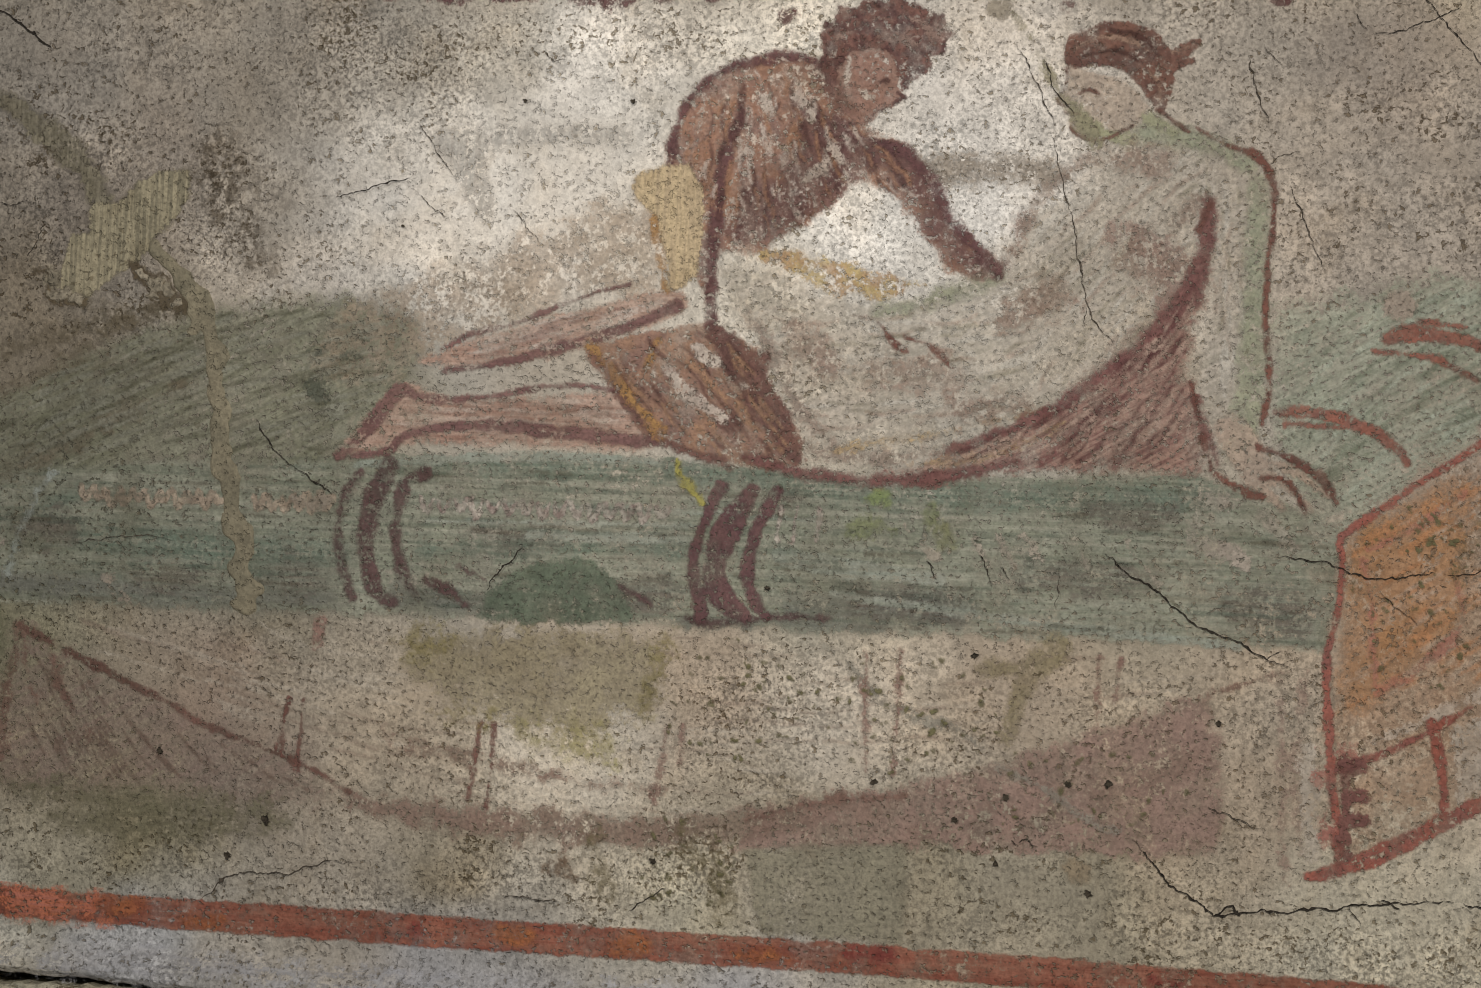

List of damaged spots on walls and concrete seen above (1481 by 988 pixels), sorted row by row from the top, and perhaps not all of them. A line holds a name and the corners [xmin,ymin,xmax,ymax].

crack [1109,557,1292,669]
crack [1271,555,1481,626]
crack [1019,775,1481,926]